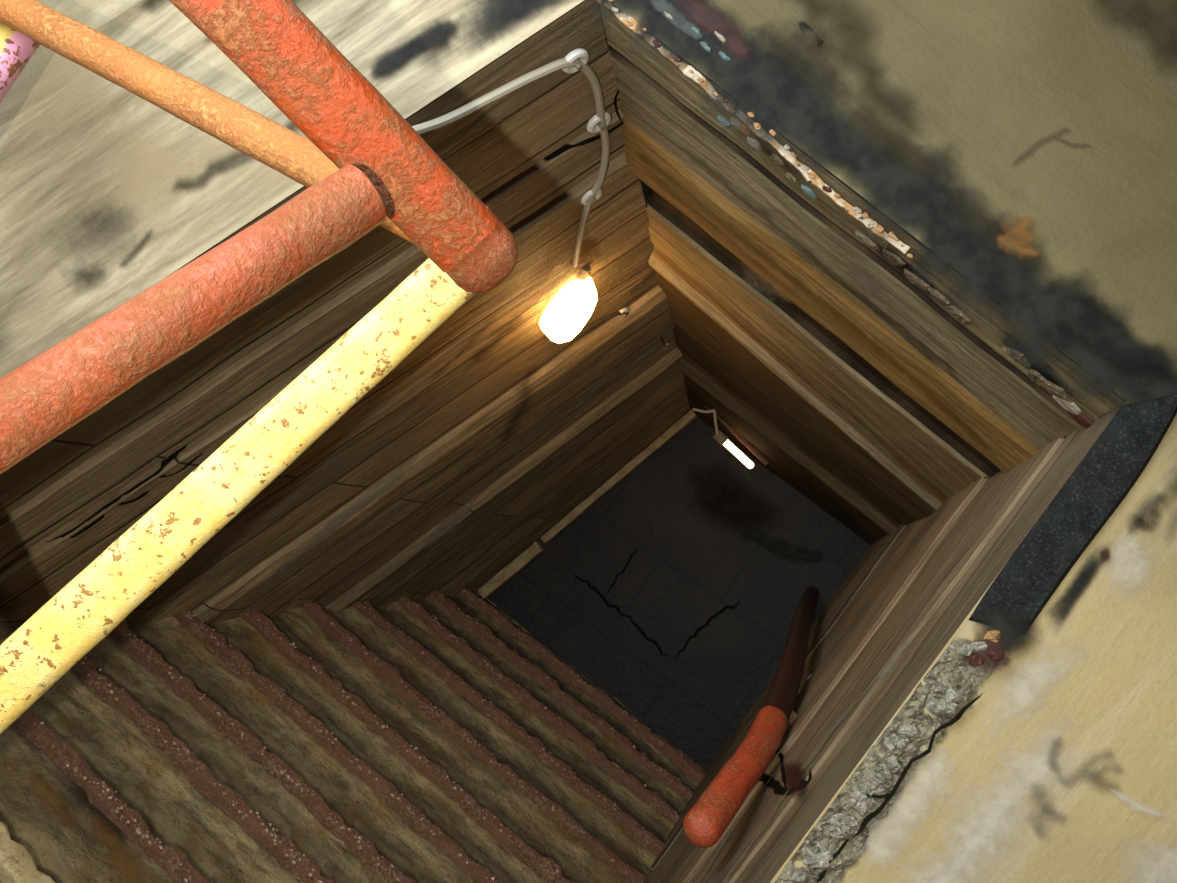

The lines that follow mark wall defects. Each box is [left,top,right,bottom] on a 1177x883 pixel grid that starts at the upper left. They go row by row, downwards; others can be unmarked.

damp [372,21,456,76]
damp [470,0,562,43]
damp [599,0,1177,409]
crack [575,549,740,657]
corrosion [83,776,163,849]
corrosion [214,783,322,883]
spalling [775,640,1012,883]
crack [816,694,982,883]